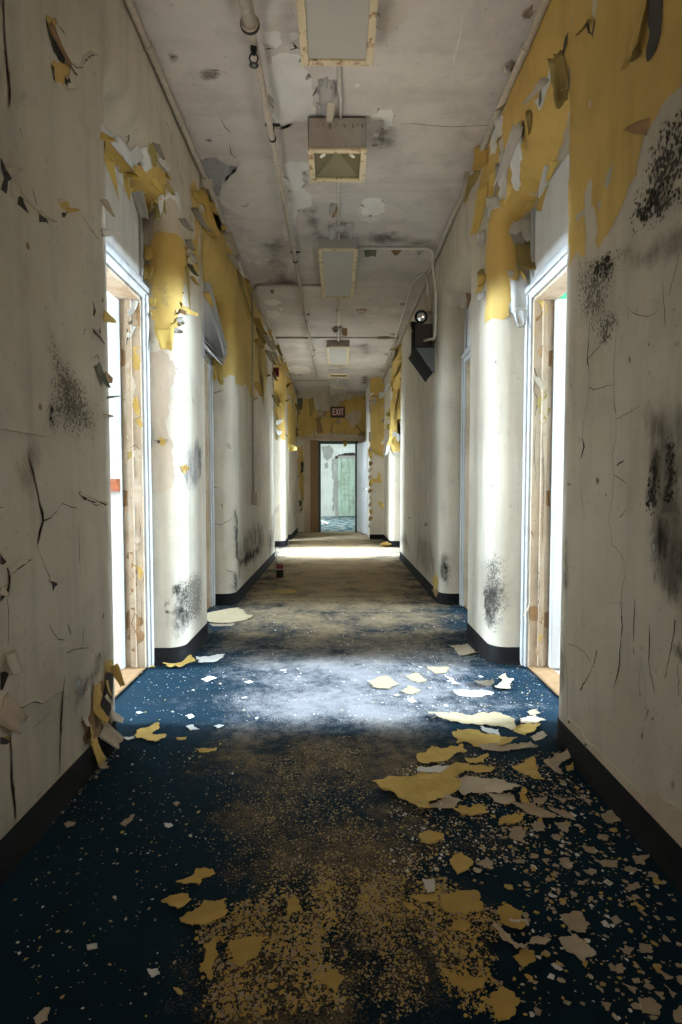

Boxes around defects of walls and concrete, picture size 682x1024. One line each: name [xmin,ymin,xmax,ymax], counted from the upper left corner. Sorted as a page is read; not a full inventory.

peeling [46,15,98,90]
peeling [460,0,682,328]
water stain [628,109,682,234]
peeling [79,31,402,652]
water stain [576,250,622,343]
crack [0,435,81,640]
water stain [166,571,203,628]
water stain [484,552,509,633]
peeling [522,601,543,655]
crack [560,289,679,704]
water stain [646,435,678,590]
spalling [77,655,217,765]